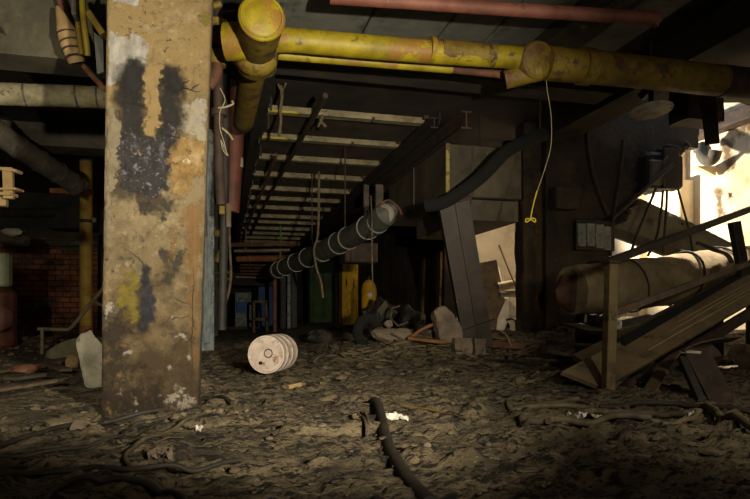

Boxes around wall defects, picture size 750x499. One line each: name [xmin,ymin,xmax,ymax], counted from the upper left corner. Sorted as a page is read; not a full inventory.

leakage [123,59,146,101]
leakage [167,67,185,94]
peeling [107,26,211,212]
leakage [112,174,172,222]
leakage [158,248,185,284]
peeling [202,224,214,344]